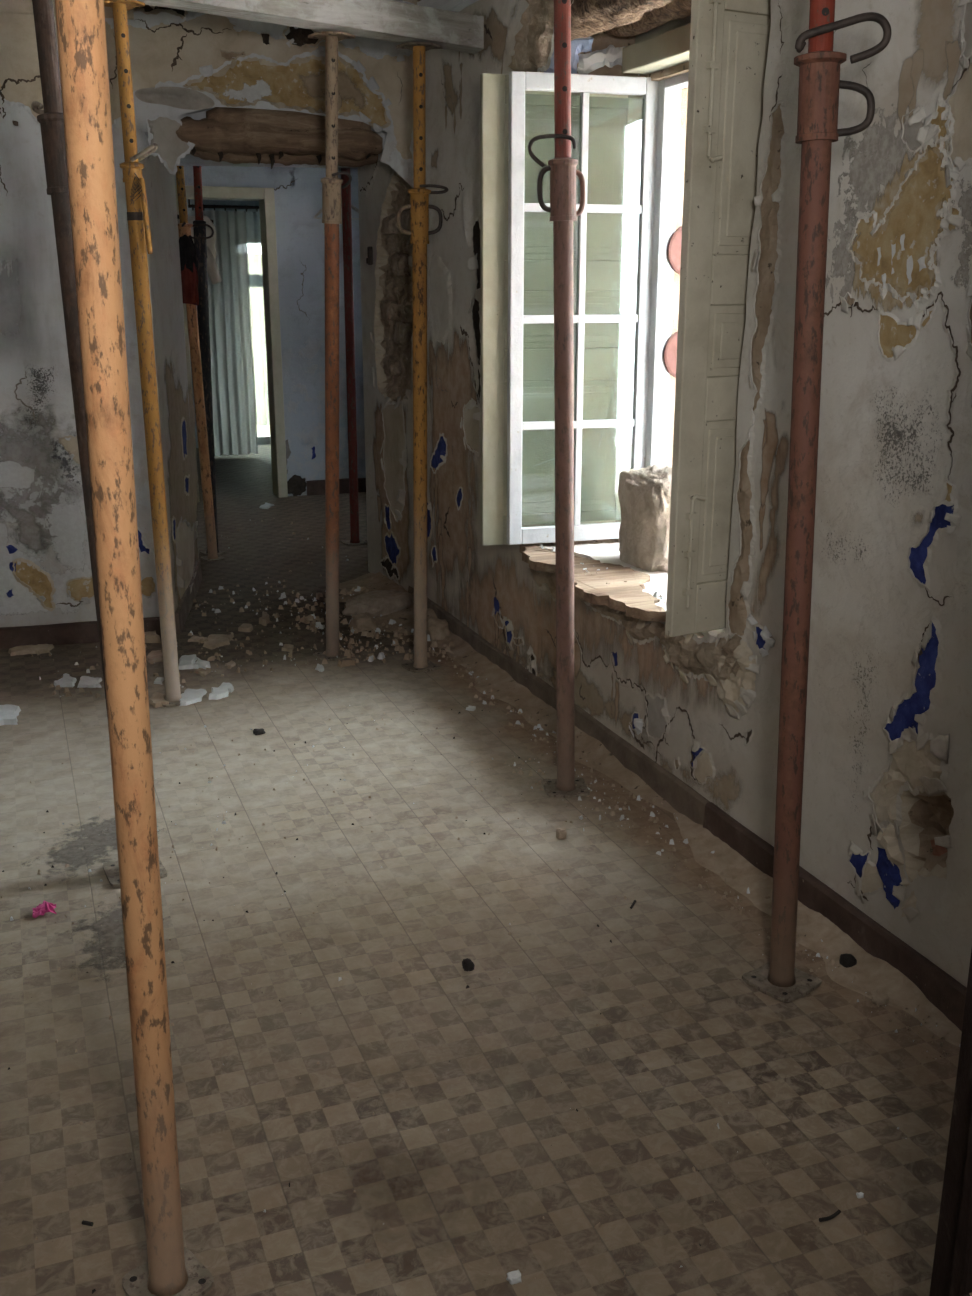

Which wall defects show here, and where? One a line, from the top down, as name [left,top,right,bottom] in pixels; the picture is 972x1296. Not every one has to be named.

peeling [0,14,44,129]
flaking render [508,0,554,73]
peeling [571,36,625,74]
crack [947,58,970,96]
peeling [839,0,972,362]
peeling [105,4,481,602]
water stain [0,364,80,552]
peeling [906,480,962,590]
peeling [494,597,537,676]
crack [545,629,751,786]
peeling [881,615,945,749]
flaking render [848,788,954,903]